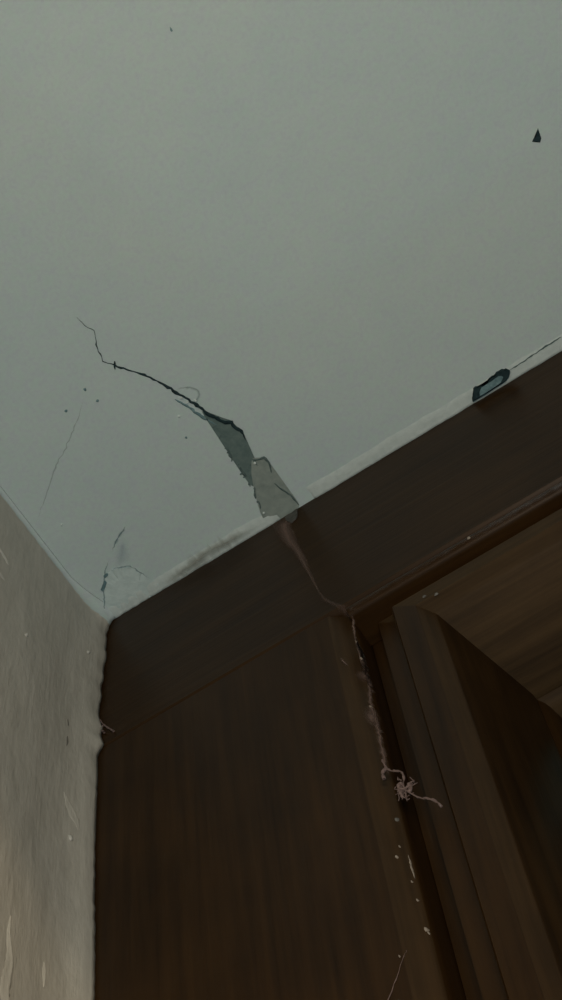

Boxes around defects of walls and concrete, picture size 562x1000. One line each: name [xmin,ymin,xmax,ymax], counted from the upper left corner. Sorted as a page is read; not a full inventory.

crack [83,324,299,519]
spalling [472,368,510,402]